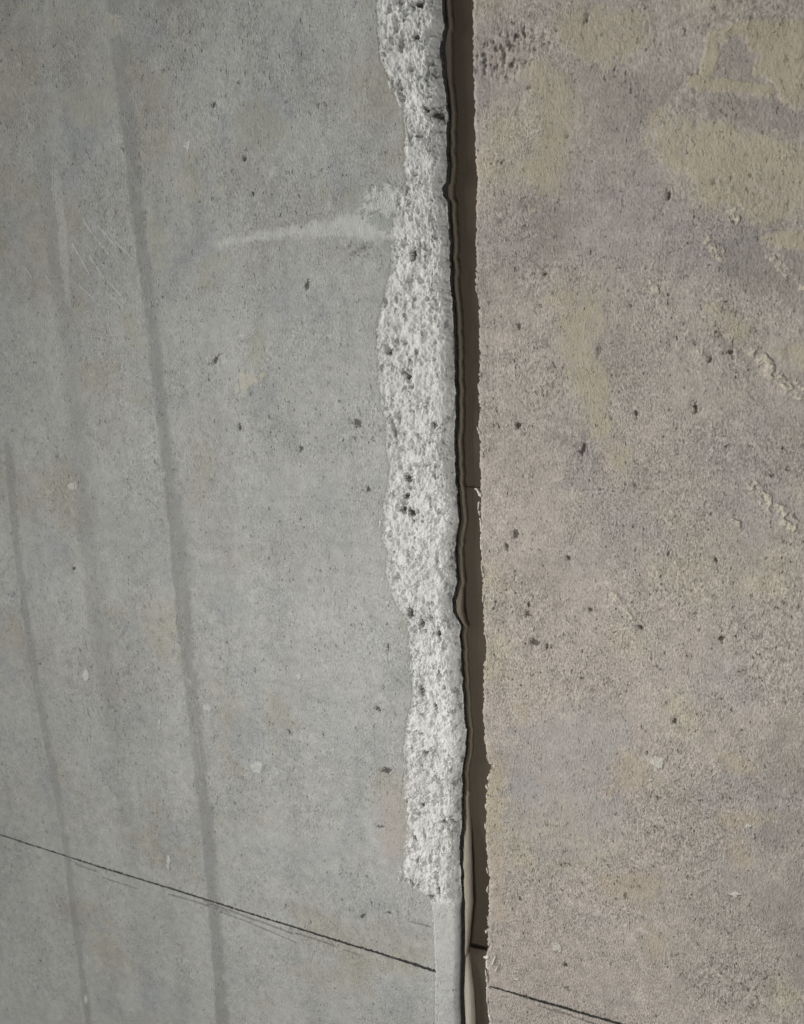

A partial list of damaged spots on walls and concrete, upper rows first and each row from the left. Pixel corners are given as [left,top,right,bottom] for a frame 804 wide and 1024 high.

damp [106,30,232,1024]
spalling [337,0,468,907]